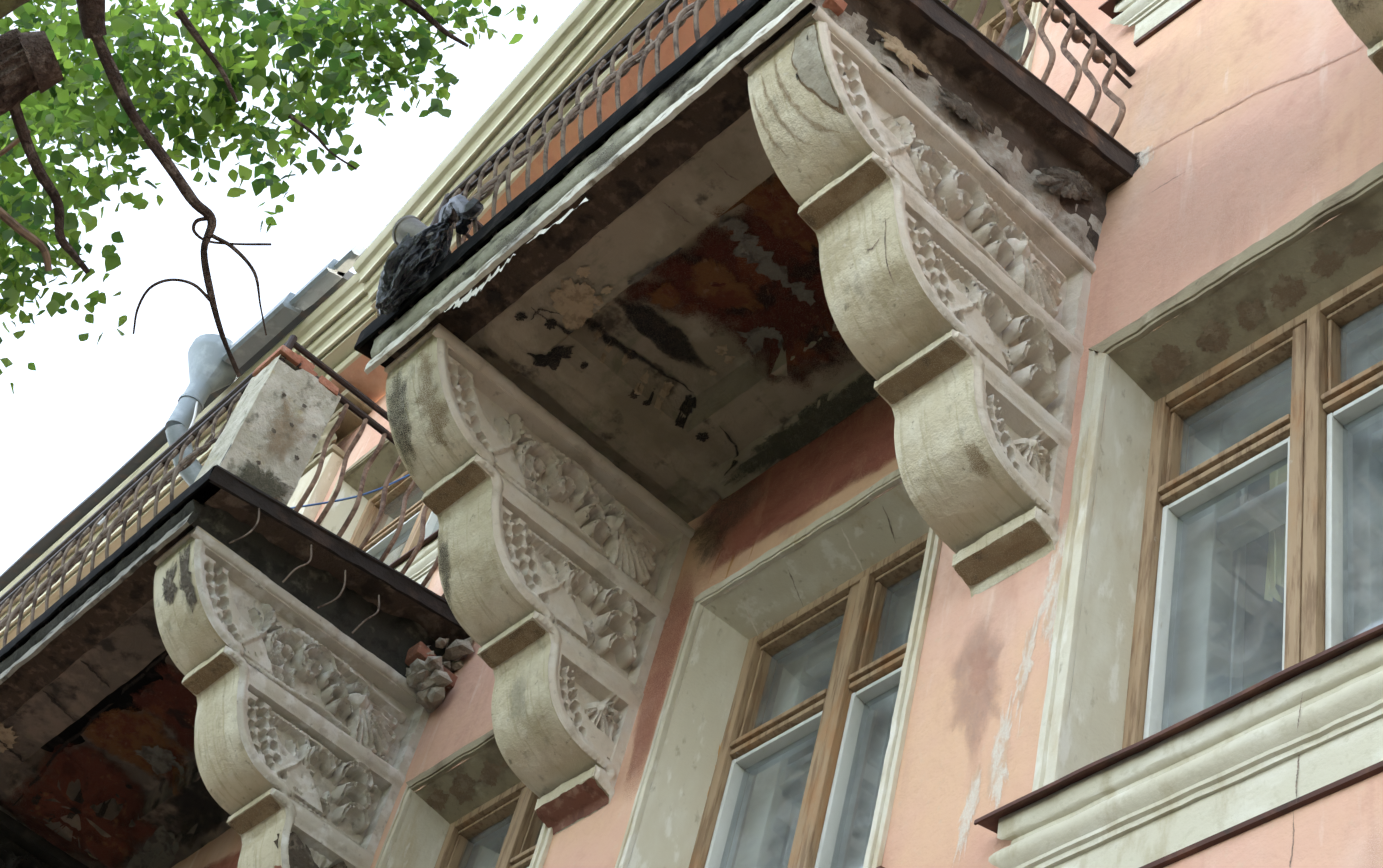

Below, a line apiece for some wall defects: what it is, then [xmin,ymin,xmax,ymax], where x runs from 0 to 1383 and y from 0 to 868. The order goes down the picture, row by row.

spalling [875,29,995,134]
spalling [528,198,588,243]
spalling [1035,165,1095,202]
spalling [444,254,516,312]
peeling [549,267,631,372]
crack [1289,692,1303,867]